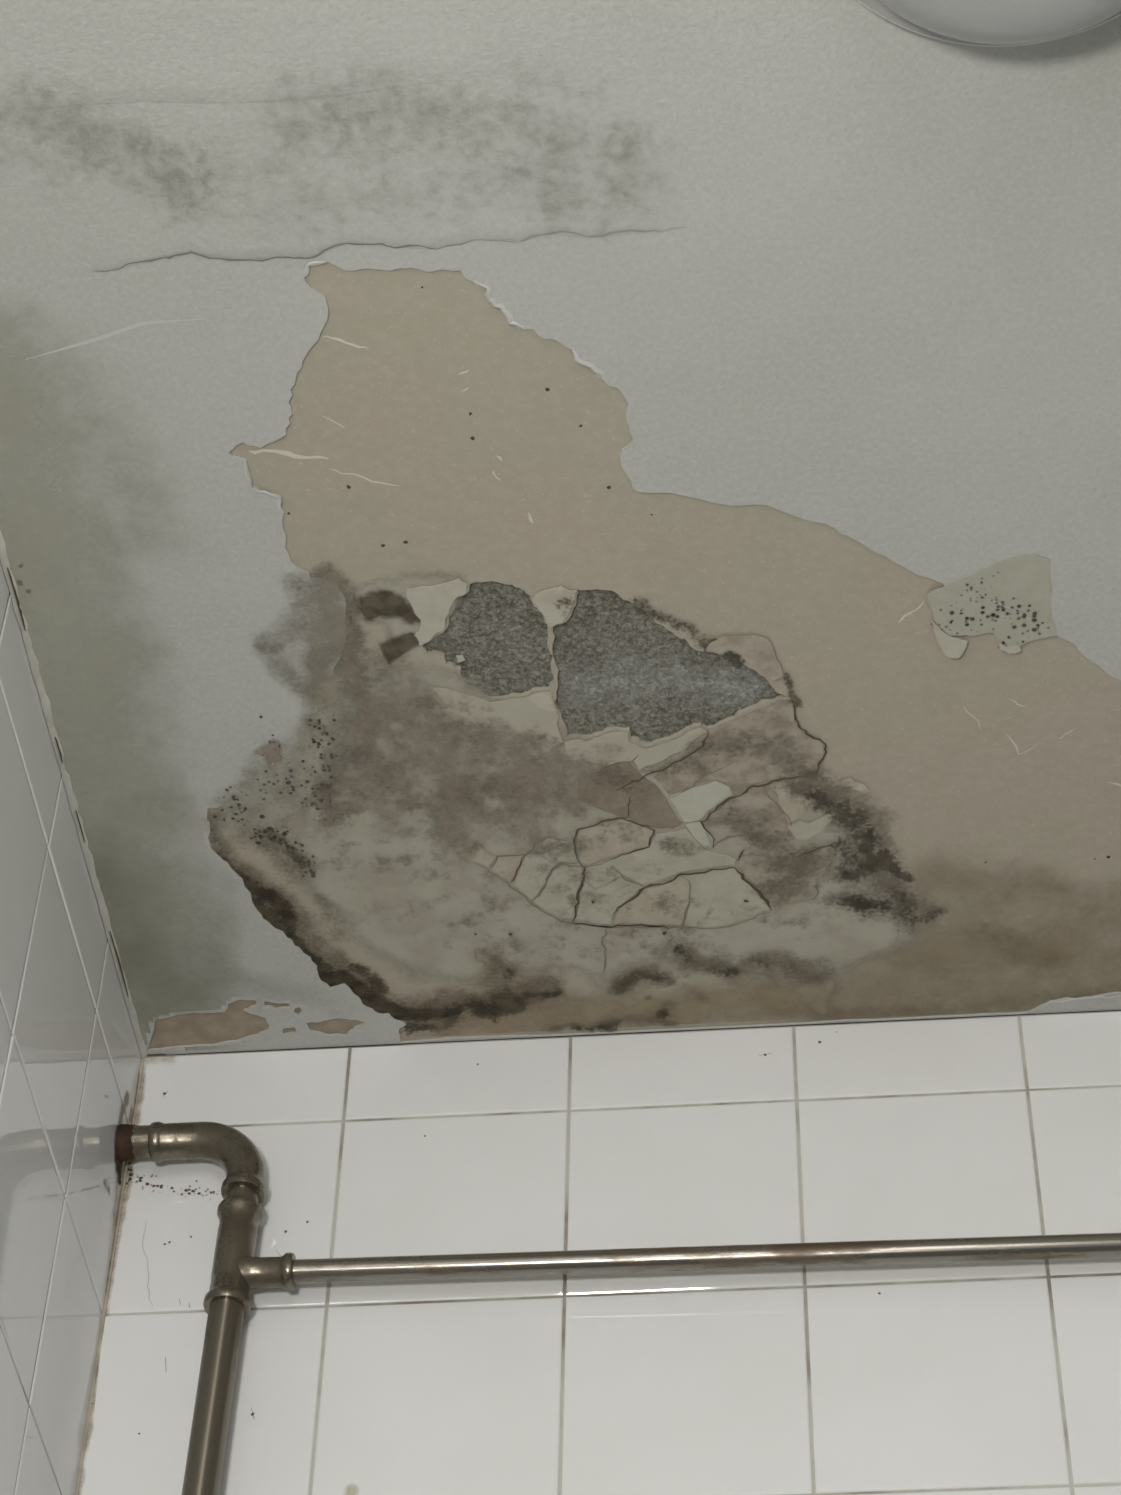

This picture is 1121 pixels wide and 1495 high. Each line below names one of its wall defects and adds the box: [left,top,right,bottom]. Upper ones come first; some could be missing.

peeling [207,261,1121,1041]
leakage [209,565,833,1036]
crack [468,704,839,973]
leakage [672,734,1089,998]
peeling [148,1000,363,1049]
rust [104,1073,215,1281]